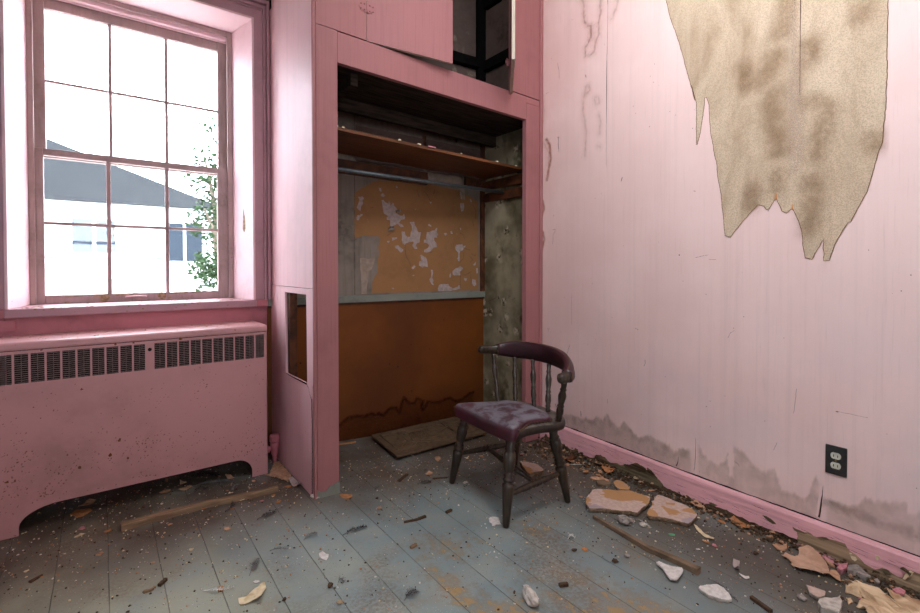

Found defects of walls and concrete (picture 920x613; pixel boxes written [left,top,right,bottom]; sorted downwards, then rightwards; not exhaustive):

peeling [666,0,889,261]
peeling [354,180,479,293]
peeling [562,446,920,613]